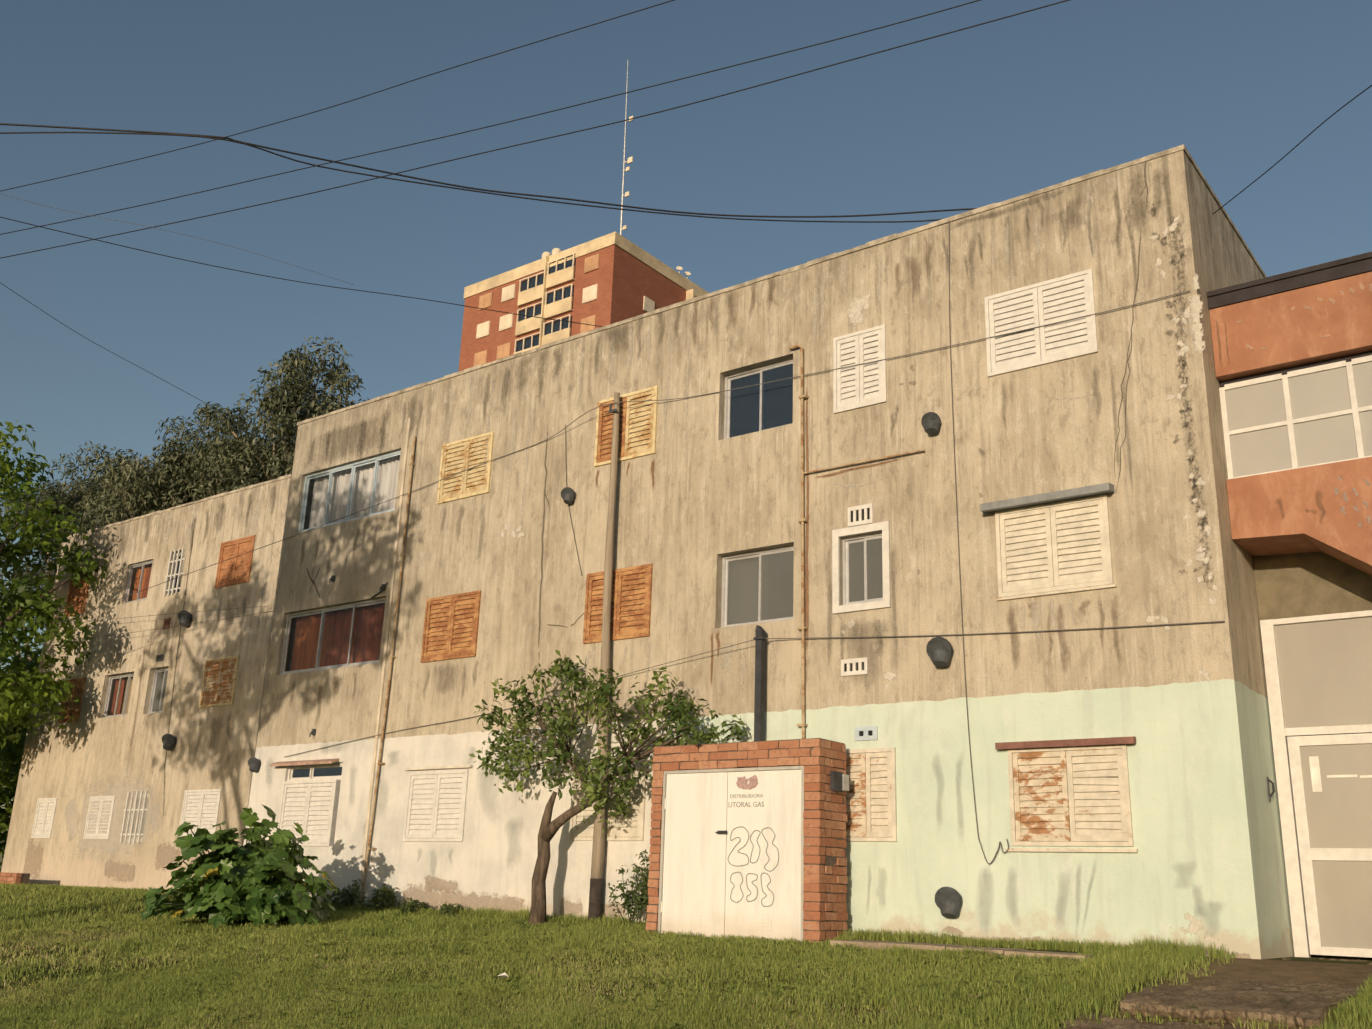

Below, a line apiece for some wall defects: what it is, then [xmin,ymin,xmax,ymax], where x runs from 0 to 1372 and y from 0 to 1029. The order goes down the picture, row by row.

crack [1140,161,1148,205]
flaking render [1149,214,1180,240]
peeling [1171,273,1205,356]
crack [1114,237,1141,482]
flaking render [1183,472,1218,606]